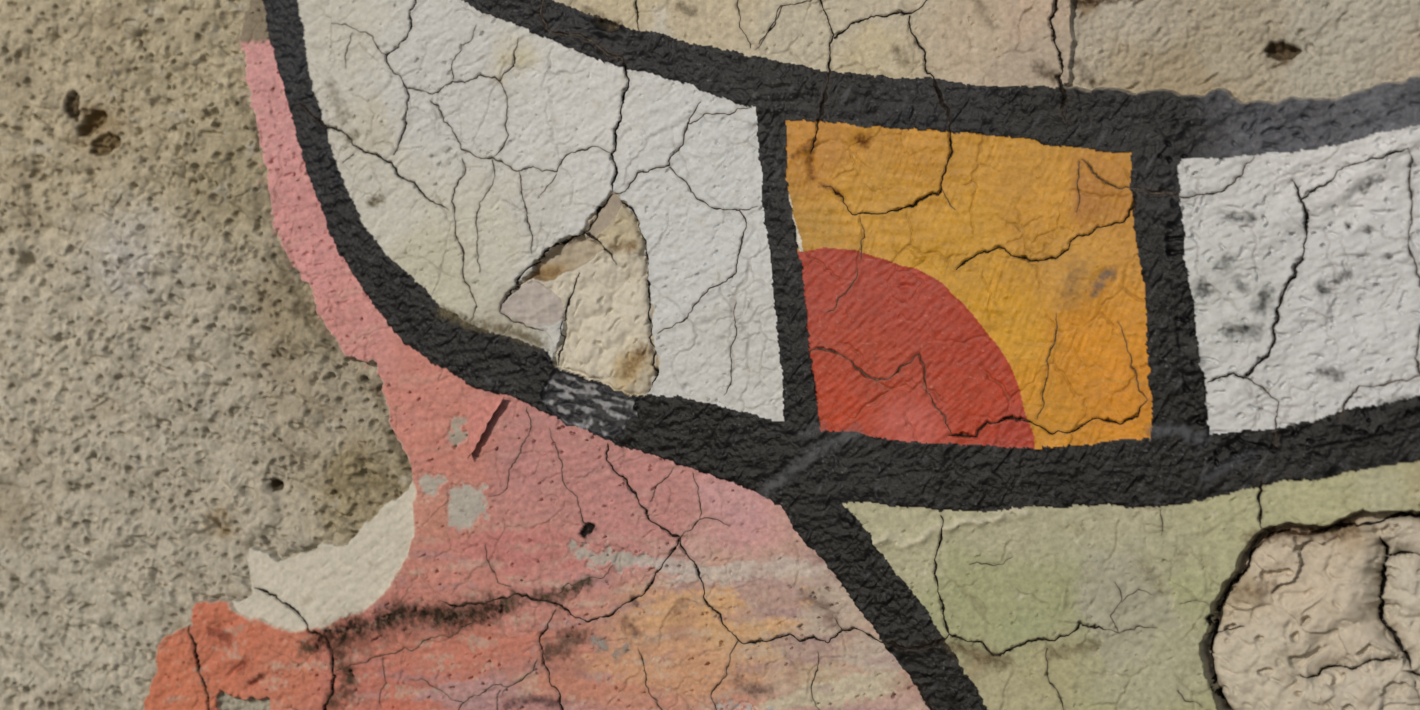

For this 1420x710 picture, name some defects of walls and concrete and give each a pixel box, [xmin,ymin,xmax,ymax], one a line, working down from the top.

flaking render [1069,0,1420,104]
peeling [445,397,504,459]
crack [300,0,757,395]
flaking render [500,192,660,440]
crack [737,0,955,312]
crack [810,321,1148,437]
crack [956,158,1254,270]
crack [1207,148,1420,444]
flaking render [217,691,270,710]
peeling [230,470,490,632]
crack [254,443,1420,710]
flaking render [1202,510,1420,710]